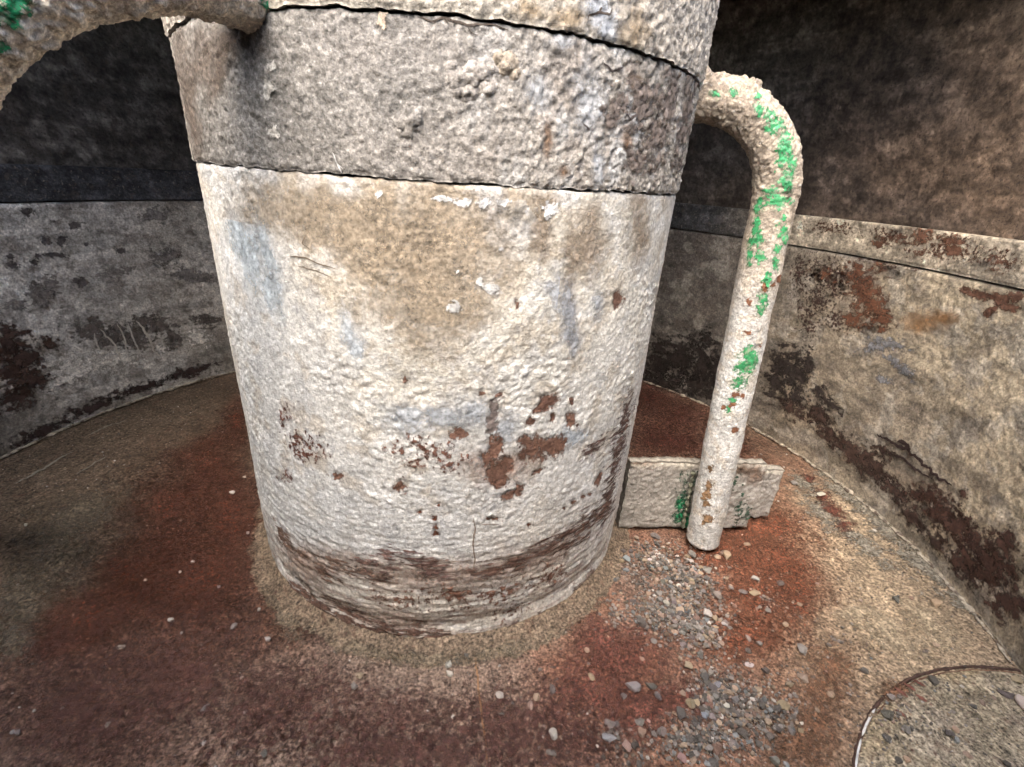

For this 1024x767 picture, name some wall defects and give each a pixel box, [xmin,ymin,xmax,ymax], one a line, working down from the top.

crack [420,16,507,35]
crack [588,7,612,20]
crack [610,91,659,123]
rust [0,392,705,767]